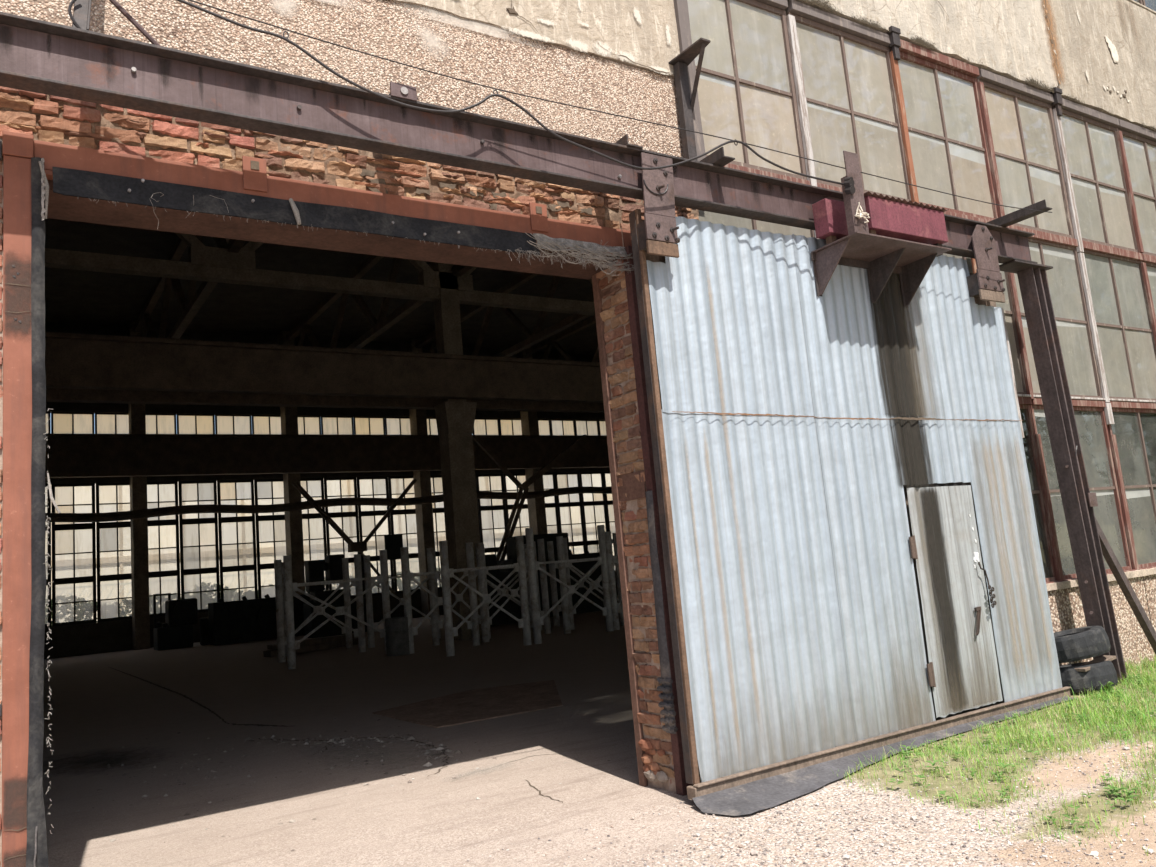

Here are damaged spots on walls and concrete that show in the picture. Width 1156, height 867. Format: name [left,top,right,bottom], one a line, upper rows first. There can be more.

flaking render [502,0,674,75]
water stain [865,273,967,711]